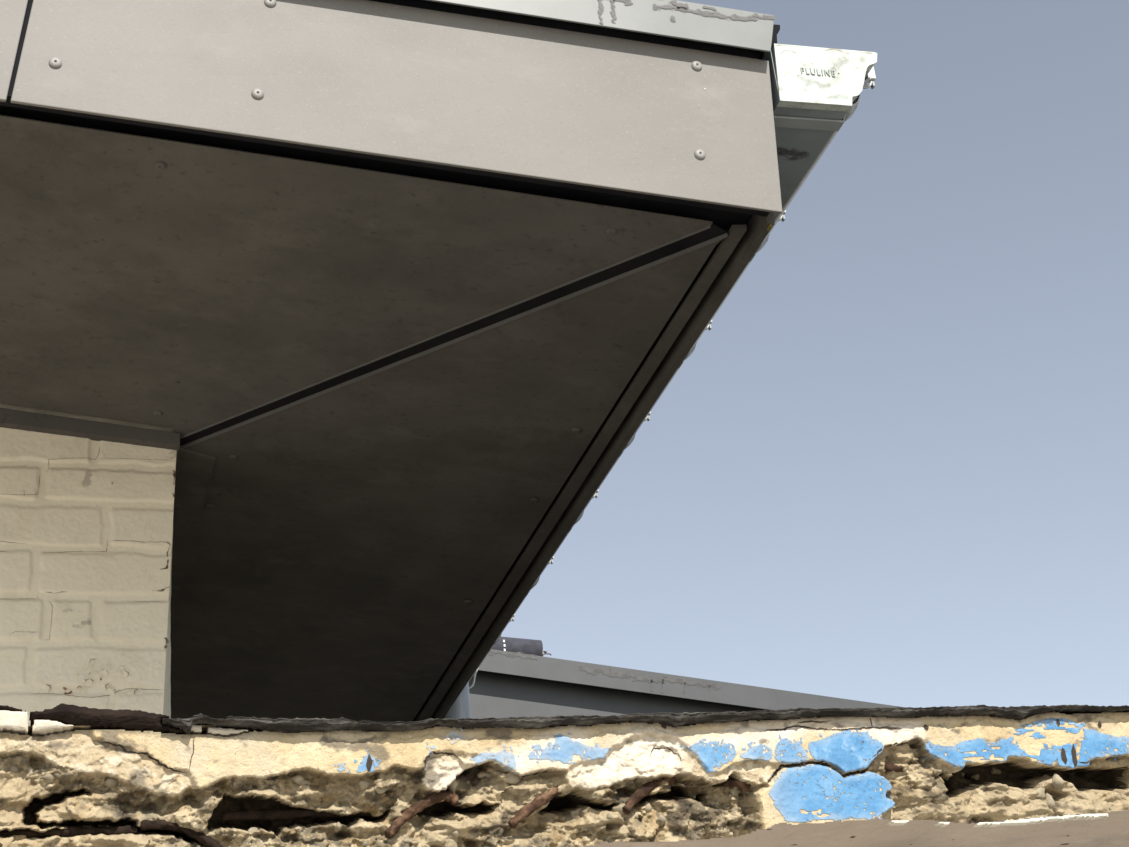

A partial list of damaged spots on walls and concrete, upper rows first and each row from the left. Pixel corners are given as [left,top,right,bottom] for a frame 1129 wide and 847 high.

spalling [0,718,1129,847]
crack [765,719,915,778]